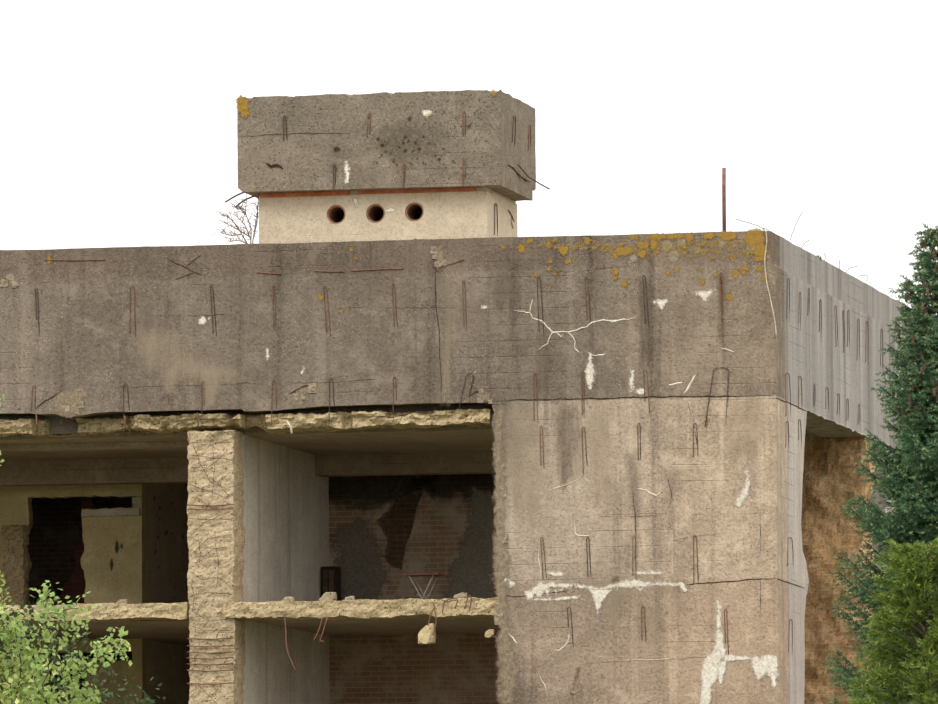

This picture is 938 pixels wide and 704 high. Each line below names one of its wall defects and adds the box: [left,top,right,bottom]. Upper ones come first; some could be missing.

crack [515,299,634,356]
water stain [584,352,594,390]
spalling [1,525,30,605]
water stain [525,571,687,614]
spalling [187,637,233,672]
water stain [700,601,779,704]